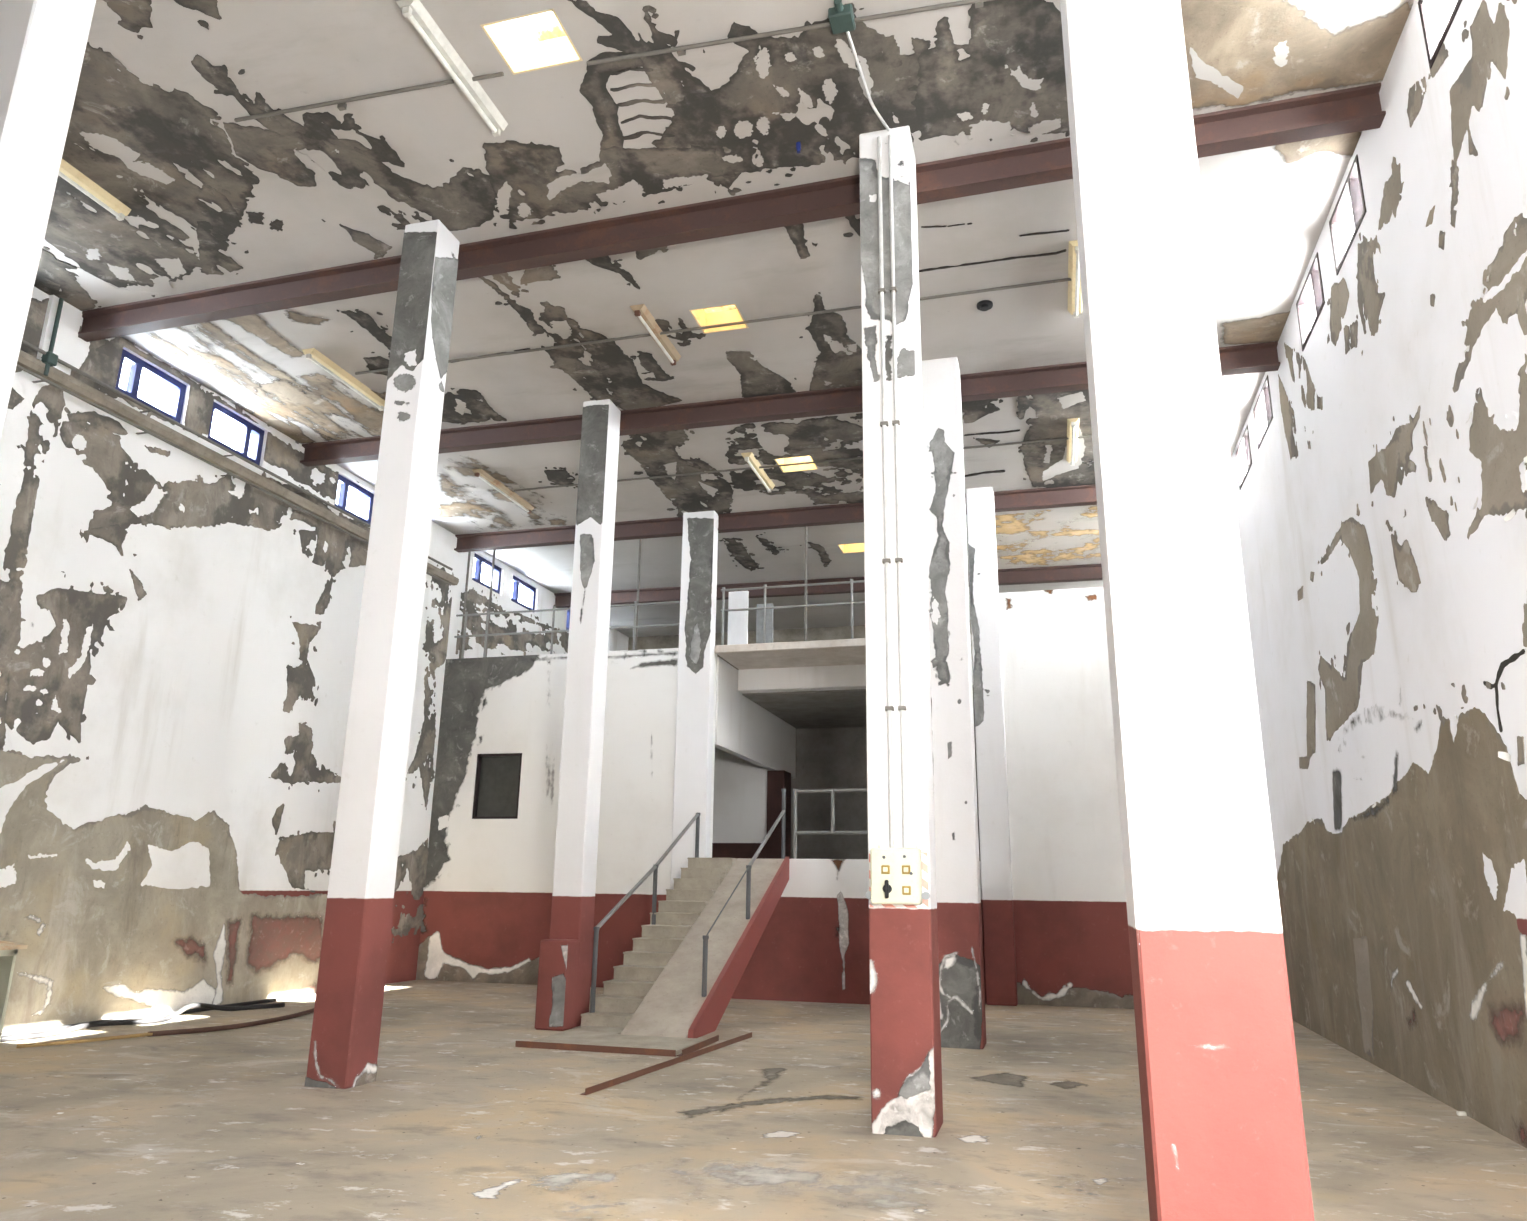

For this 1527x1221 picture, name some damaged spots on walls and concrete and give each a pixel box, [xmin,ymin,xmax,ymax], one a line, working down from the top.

peeling [1407,0,1517,250]
peeling [1327,157,1404,355]
peeling [0,0,1070,1033]
peeling [1278,343,1323,459]
peeling [1297,213,1527,769]
crack [1483,649,1525,732]
peeling [1277,683,1527,1148]
peeling [872,952,982,1138]